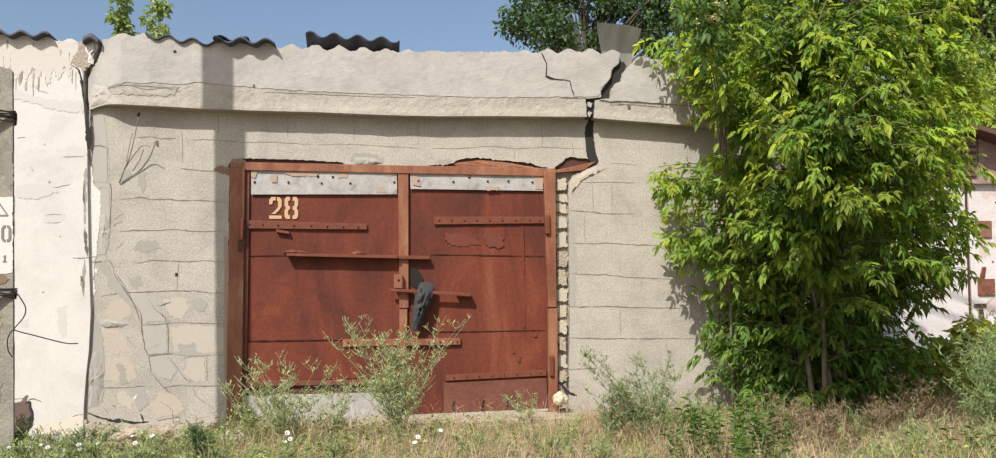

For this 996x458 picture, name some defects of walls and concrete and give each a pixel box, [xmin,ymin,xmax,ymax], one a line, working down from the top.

crack [271,90,378,98]
peeling [88,162,101,320]
crack [19,52,226,424]
crack [138,123,299,172]
rust [213,165,230,175]
crack [324,52,694,396]
rust [535,176,543,189]
peeling [103,300,137,409]
peeling [163,296,224,382]
spalling [83,391,221,442]